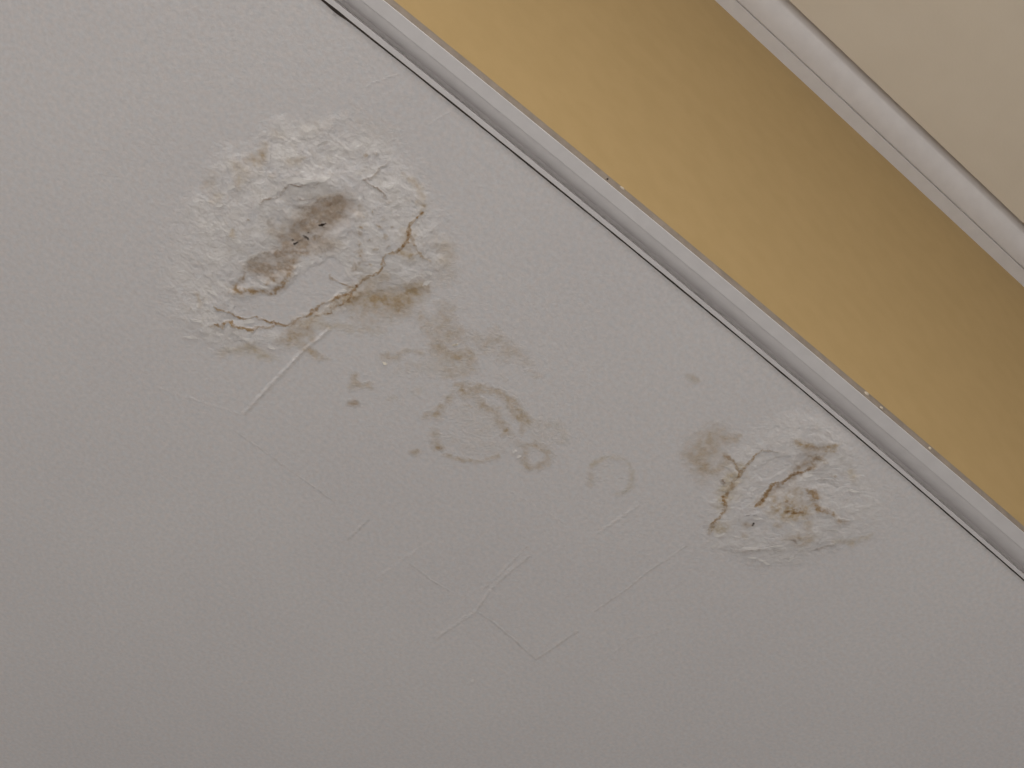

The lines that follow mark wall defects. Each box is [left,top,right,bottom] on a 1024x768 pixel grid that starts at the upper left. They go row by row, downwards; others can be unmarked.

crack [209,163,433,334]
damp [212,230,573,473]
crack [321,0,1024,581]
damp [673,414,746,490]